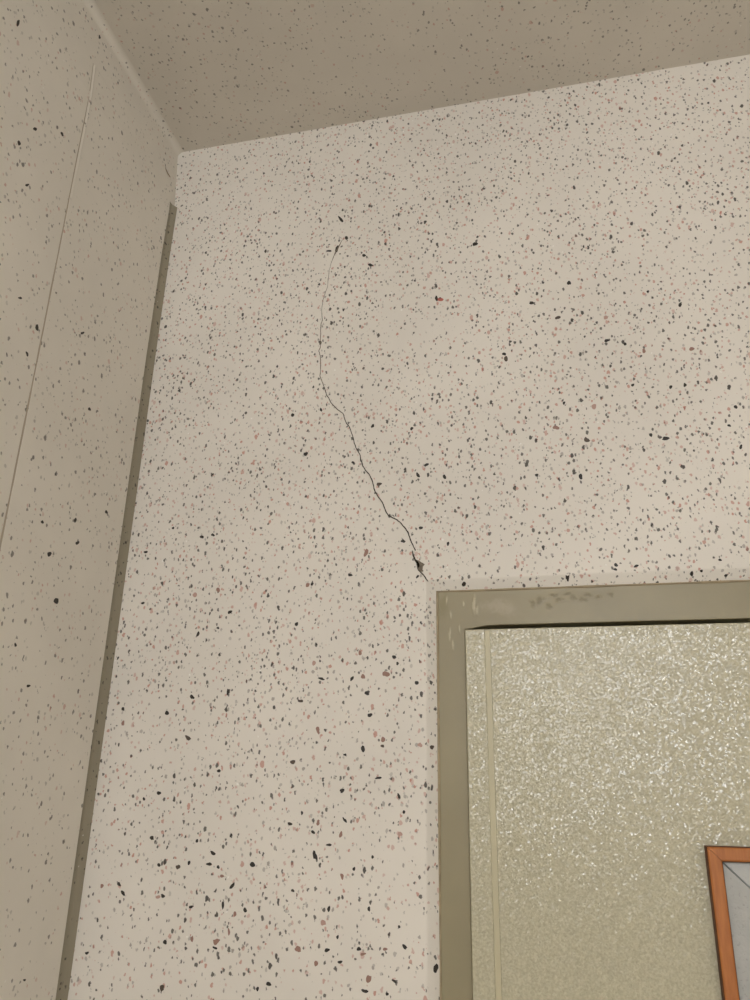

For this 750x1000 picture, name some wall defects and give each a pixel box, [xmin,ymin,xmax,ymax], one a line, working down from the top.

crack [319,238,428,581]